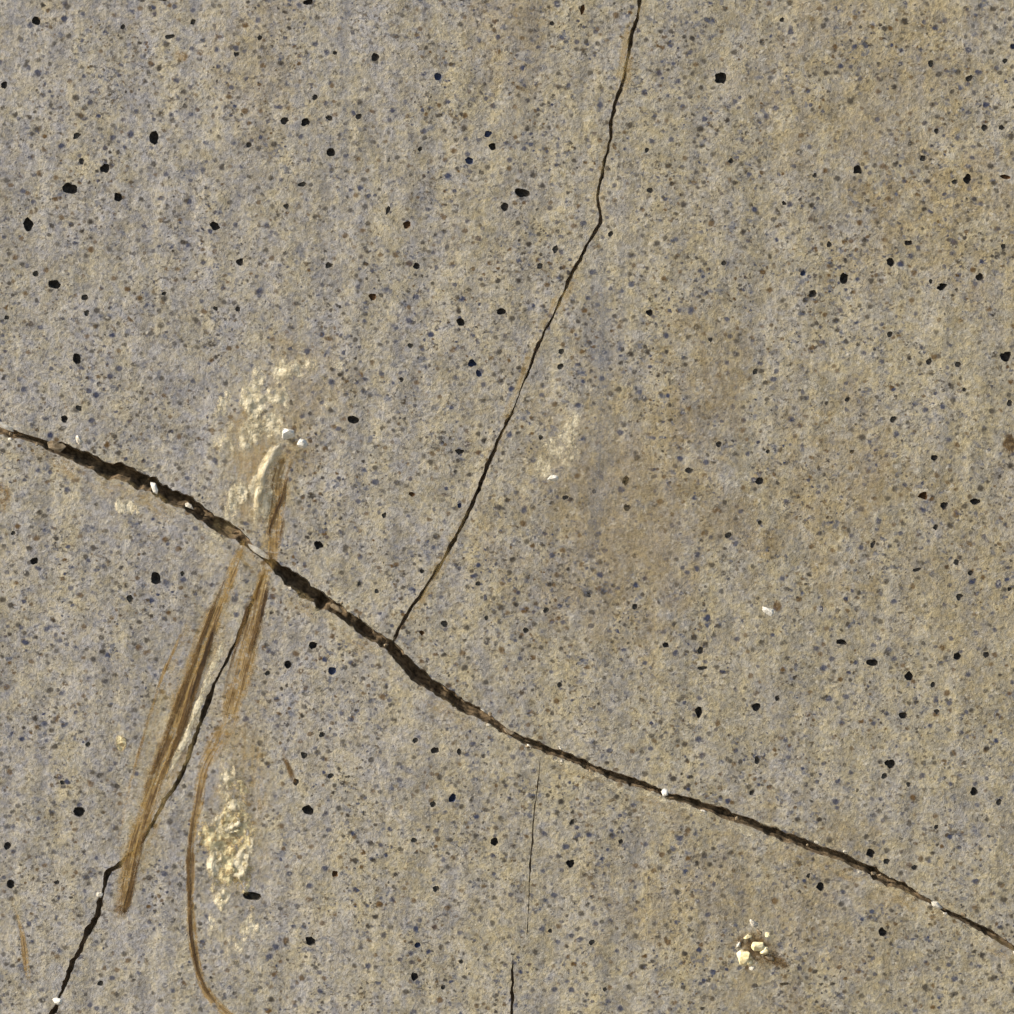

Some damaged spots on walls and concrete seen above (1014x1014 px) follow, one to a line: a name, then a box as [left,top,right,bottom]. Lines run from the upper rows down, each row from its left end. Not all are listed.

crack [392,0,642,643]
rust [115,544,244,914]
rust [186,409,291,1014]
rust [283,756,295,782]
crack [0,422,1014,1014]